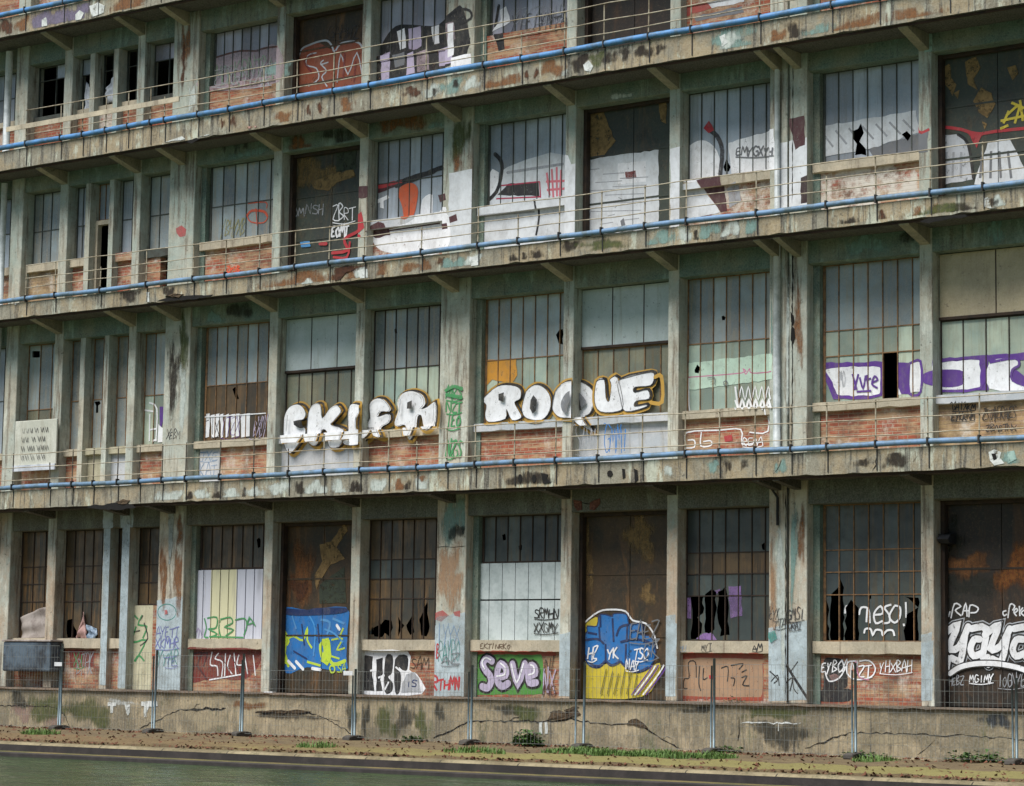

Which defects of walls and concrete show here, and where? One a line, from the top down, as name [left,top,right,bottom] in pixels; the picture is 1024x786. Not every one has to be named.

damp [169,312,189,429]
corrosion [160,515,183,615]
corrosion [948,542,1024,595]
crack [738,495,1023,754]
damp [13,691,110,728]
crack [141,704,226,728]
crack [434,716,678,748]